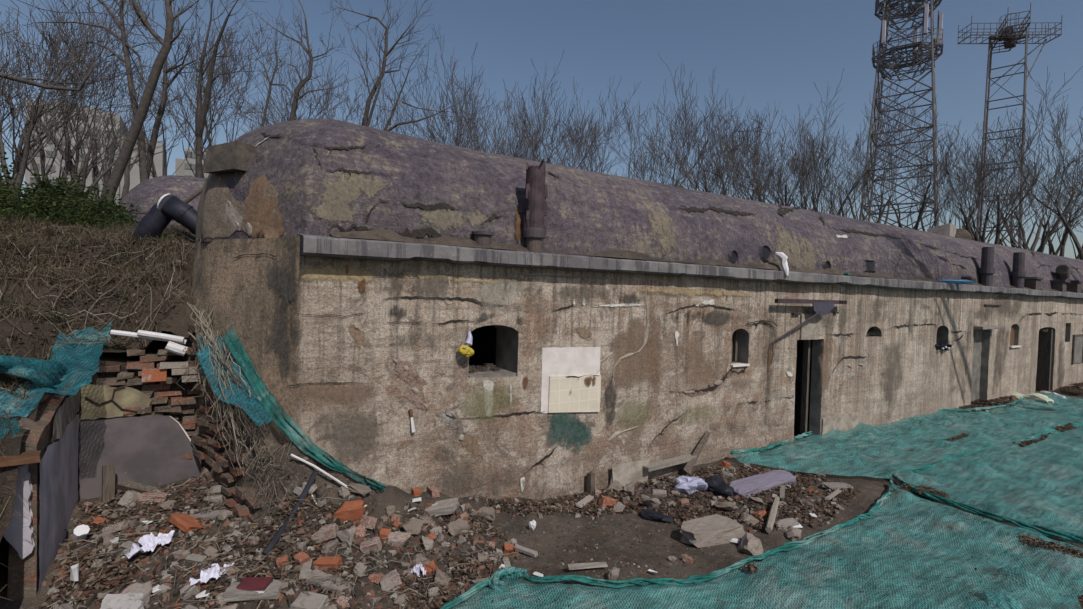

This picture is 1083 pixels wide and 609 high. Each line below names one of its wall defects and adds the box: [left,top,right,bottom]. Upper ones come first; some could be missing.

crack [255,132,510,239]
peeling [196,173,285,242]
crack [383,296,518,329]
crack [446,411,542,419]
leakage [547,412,592,453]
crack [643,366,747,454]
crack [526,448,555,473]